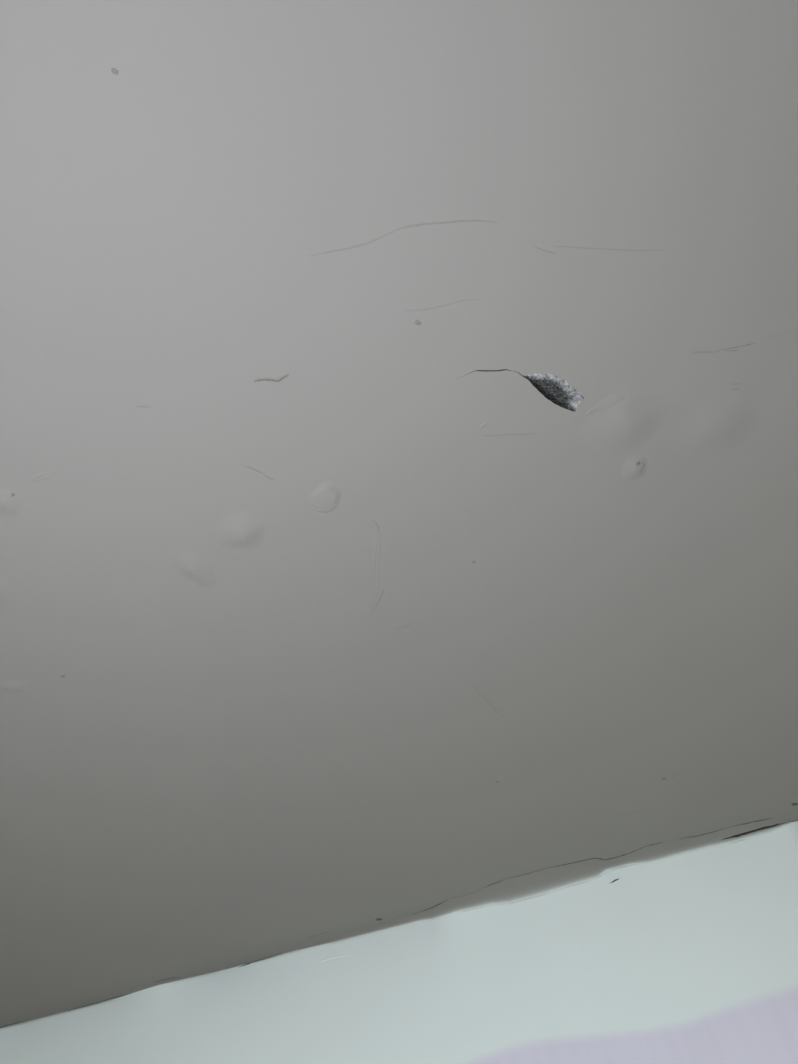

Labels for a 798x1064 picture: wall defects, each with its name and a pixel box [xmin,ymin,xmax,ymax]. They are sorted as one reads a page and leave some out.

spalling [523,373,584,412]
crack [413,818,798,915]
crack [69,993,131,1011]